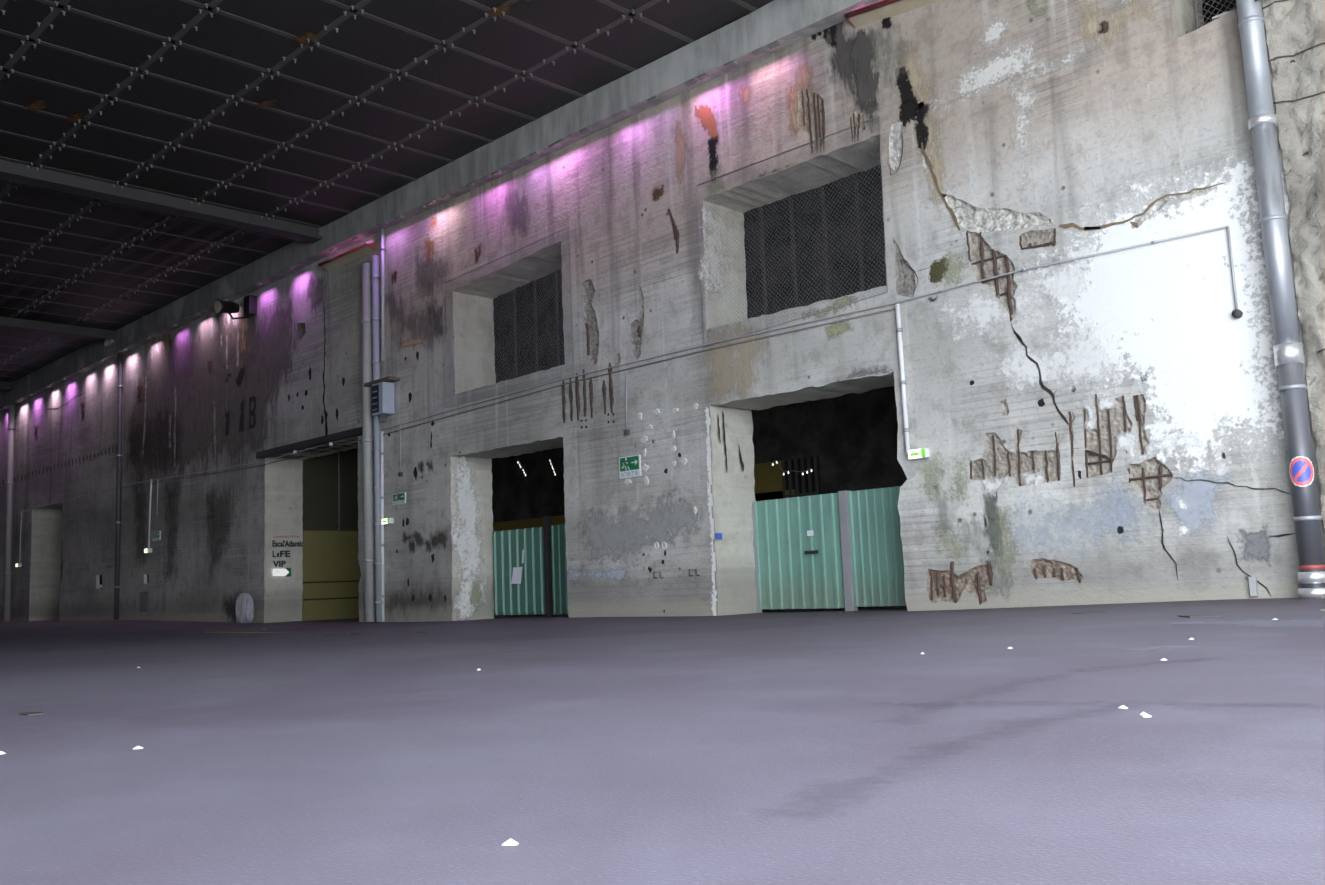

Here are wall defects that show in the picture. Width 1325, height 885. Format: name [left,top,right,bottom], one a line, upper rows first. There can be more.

rust [695,105,718,140]
rust [652,185,664,201]
crack [887,130,960,230]
crack [1059,182,1226,231]
leakage [308,277,323,309]
spalling [944,194,1058,321]
leakage [128,303,295,484]
crack [1010,320,1112,461]
peeling [968,328,1173,511]
spalling [927,560,993,605]
leakage [984,495,1011,591]
spalling [1030,558,1083,583]